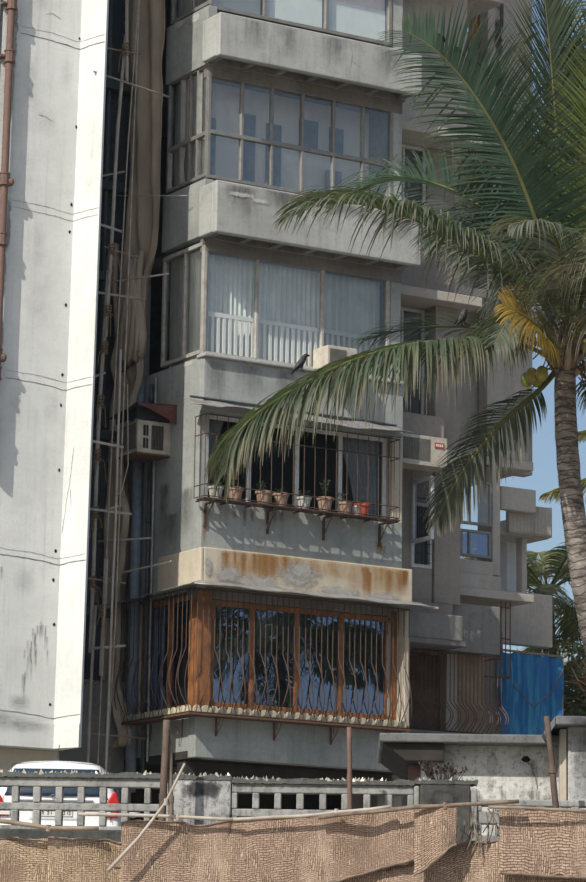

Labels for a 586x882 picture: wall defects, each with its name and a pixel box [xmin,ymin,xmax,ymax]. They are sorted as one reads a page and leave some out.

rust [158,547,412,607]